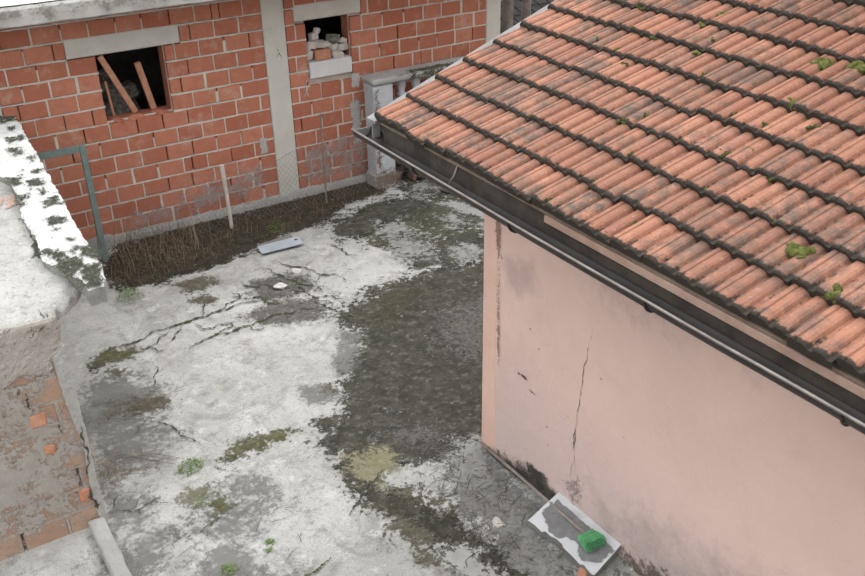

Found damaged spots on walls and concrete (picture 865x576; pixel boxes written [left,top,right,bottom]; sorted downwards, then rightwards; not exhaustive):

leakage [299,331,362,406]
spalling [29,412,47,429]
crack [566,336,592,489]
leakage [381,433,578,576]
leakage [617,548,666,576]